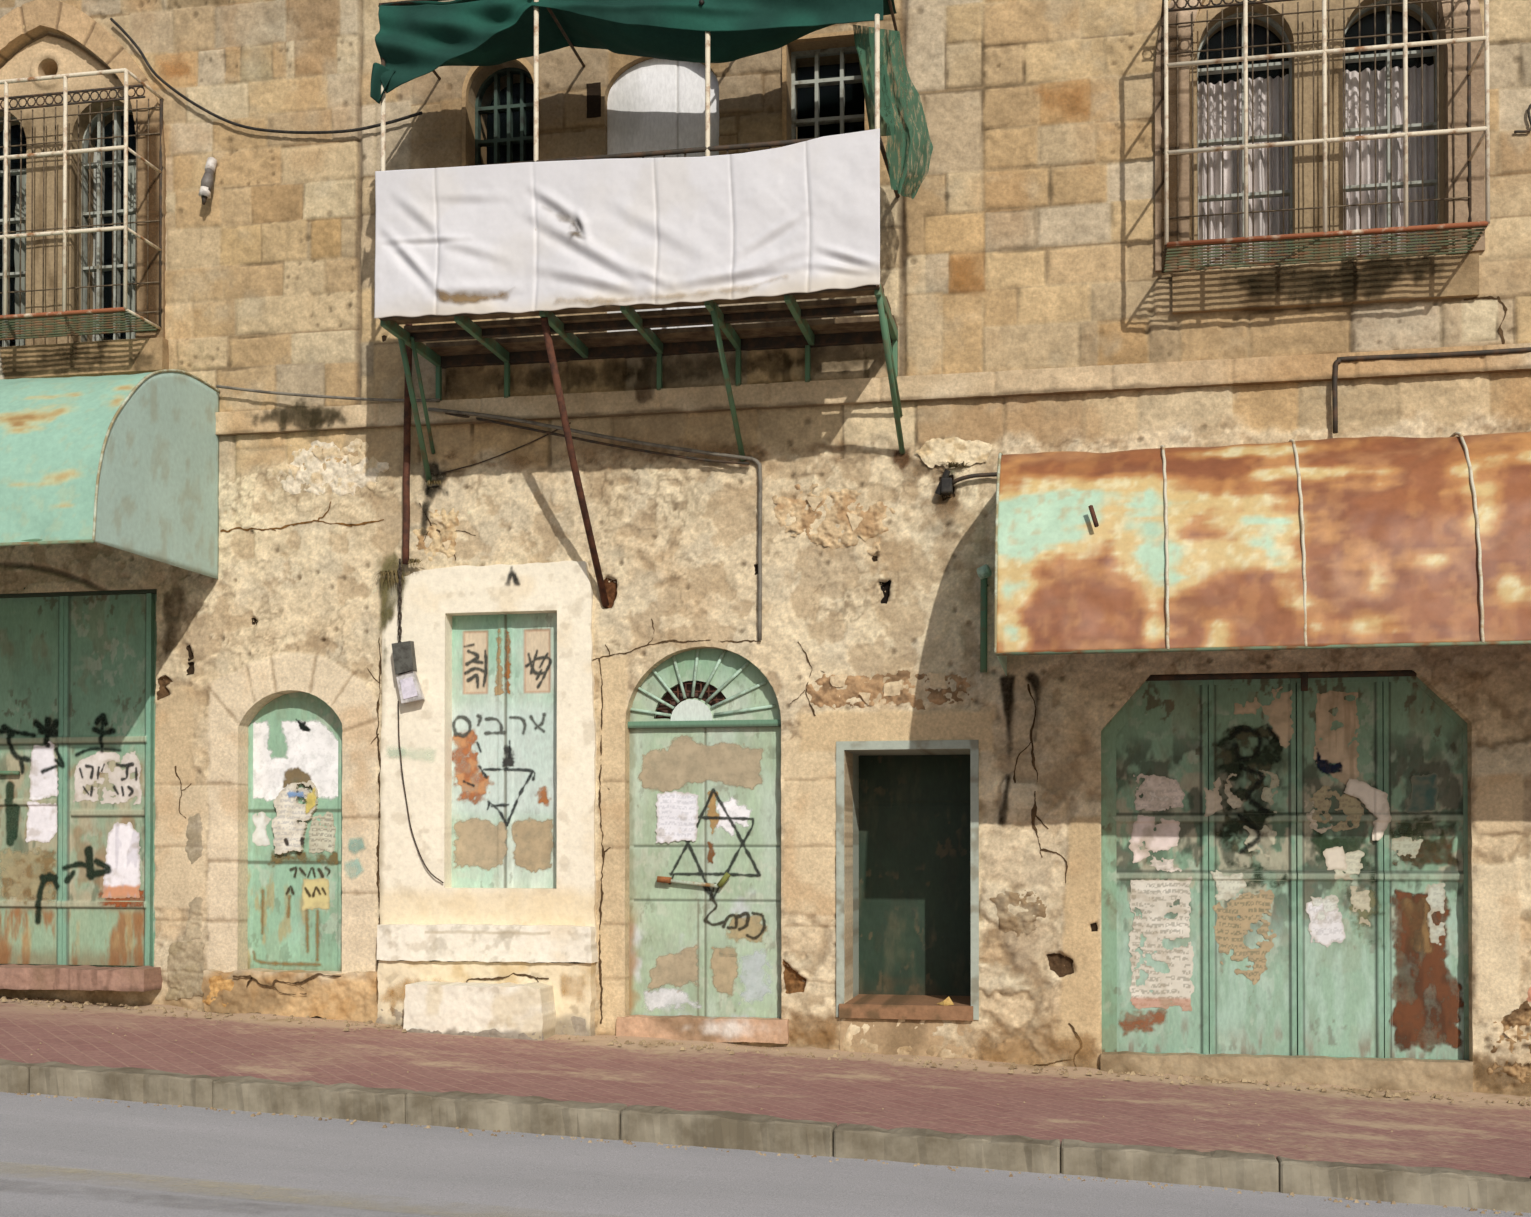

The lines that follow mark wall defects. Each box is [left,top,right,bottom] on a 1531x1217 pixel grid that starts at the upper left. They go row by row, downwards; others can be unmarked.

damp [1236,254,1436,301]
peeling [272,438,389,496]
crack [220,501,384,532]
crack [419,503,476,560]
peeling [806,670,973,710]
crack [1013,684,1068,883]
corrosion [1393,838,1458,869]
corrosion [1389,889,1464,1051]
peeling [1504,1025,1517,1042]